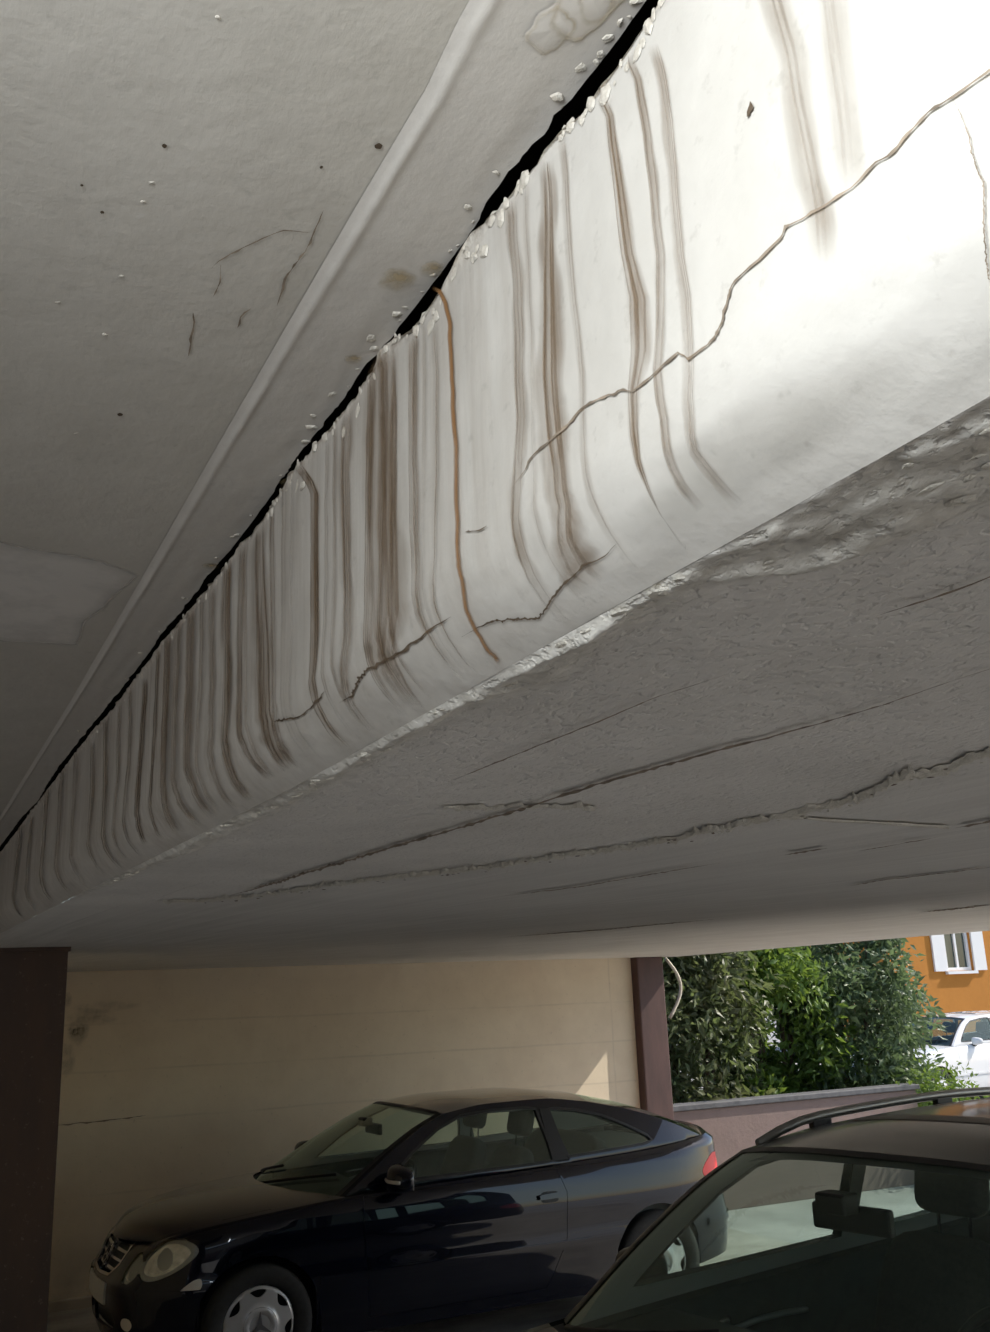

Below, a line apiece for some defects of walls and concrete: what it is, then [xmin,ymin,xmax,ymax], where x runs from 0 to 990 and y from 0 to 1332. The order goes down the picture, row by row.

water stain [605,107,624,243]
water stain [544,241,557,381]
crack [513,69,990,486]
crack [0,0,658,851]
rust [437,289,498,660]
water stain [307,476,318,632]
crack [881,576,990,615]
crack [233,669,990,896]
crack [64,1115,146,1126]